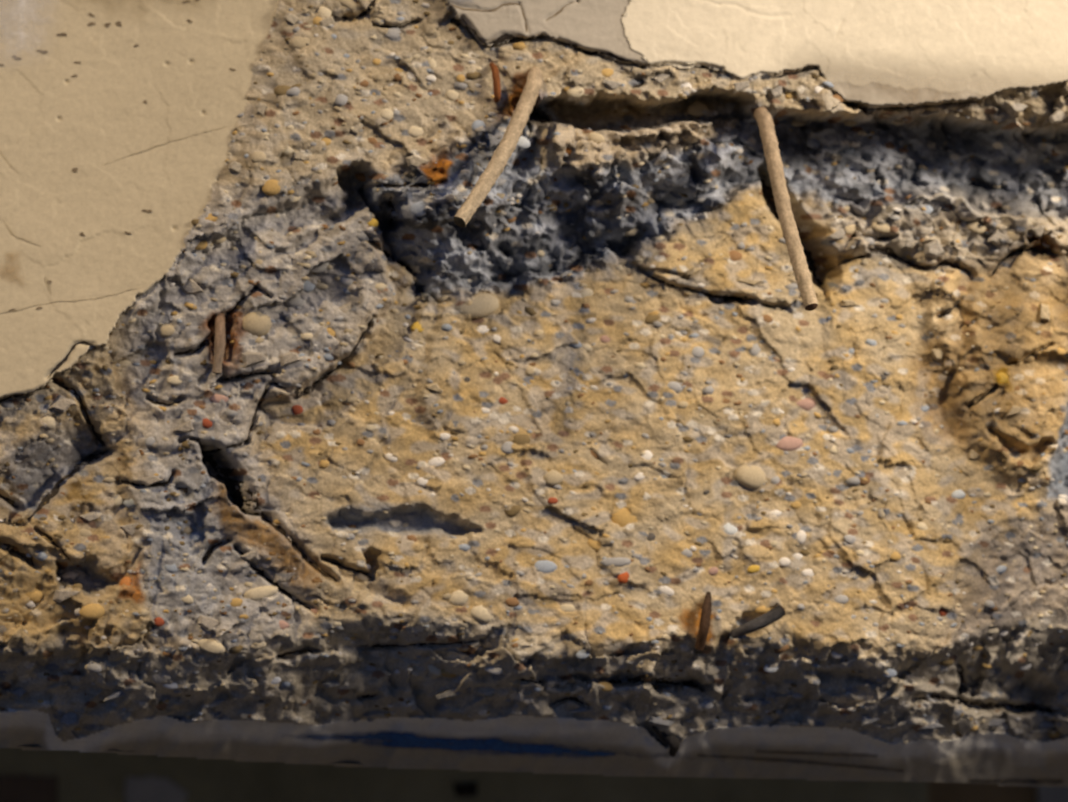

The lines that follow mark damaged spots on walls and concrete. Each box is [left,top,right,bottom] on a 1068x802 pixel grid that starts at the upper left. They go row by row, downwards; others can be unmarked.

corrosion [501,73,528,116]
spalling [356,0,1068,311]
crack [367,181,444,272]
crack [639,179,1035,310]
corrosion [203,315,243,366]
crack [227,287,270,315]
spalling [0,0,543,659]
crack [121,473,188,493]
crack [175,319,374,581]
spalling [0,185,1068,748]
crack [202,540,311,610]
corrosion [683,606,714,642]